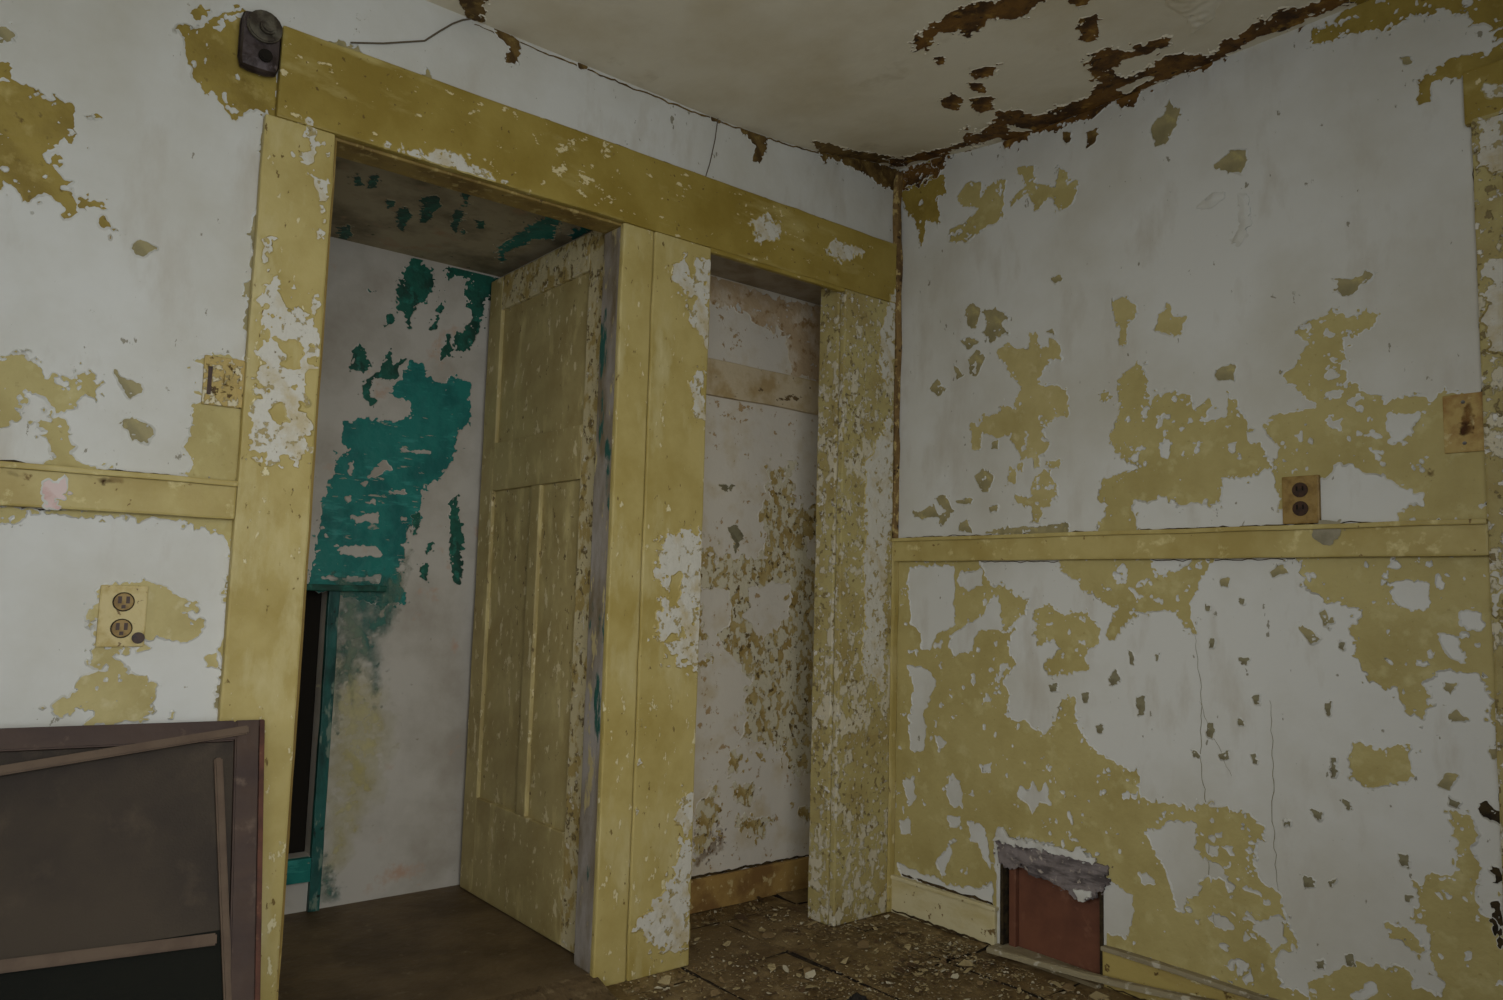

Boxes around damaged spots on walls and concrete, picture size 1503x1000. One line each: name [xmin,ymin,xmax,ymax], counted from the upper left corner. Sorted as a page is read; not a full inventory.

peeling [0,21,159,259]
peeling [810,0,1503,247]
peeling [0,348,156,469]
peeling [0,491,232,612]
peeling [38,574,207,726]
peeling [179,209,322,481]
peeling [288,116,591,854]
peeling [669,252,821,421]
peeling [875,285,896,385]
peeling [912,303,1070,535]
peeling [617,410,1503,1000]
peeling [1097,269,1487,531]